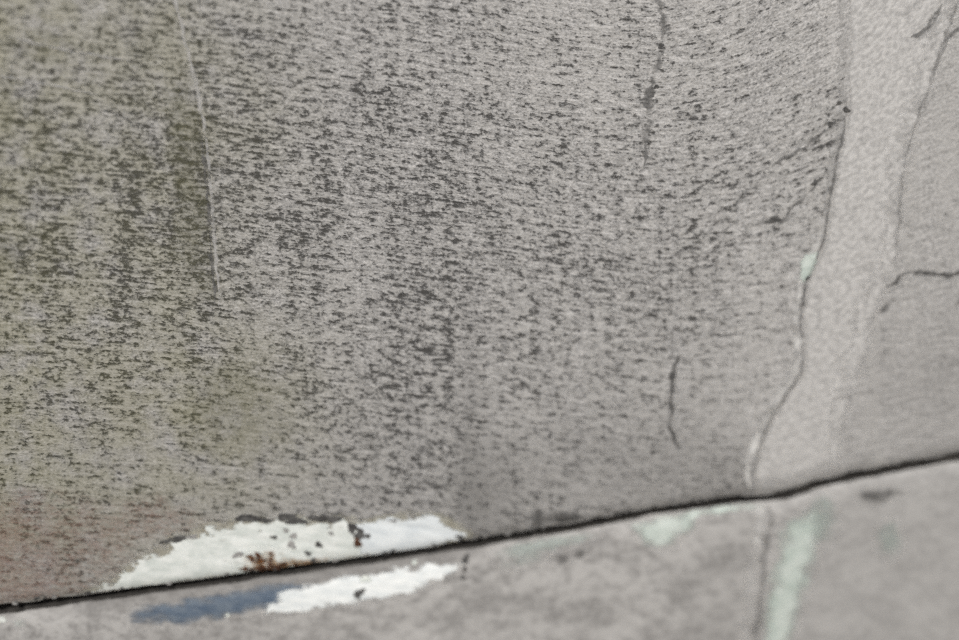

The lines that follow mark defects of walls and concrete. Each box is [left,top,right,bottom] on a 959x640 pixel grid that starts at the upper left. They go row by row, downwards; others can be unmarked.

crack [644,1,666,166]
crack [742,0,851,640]
crack [882,271,959,312]
rust [240,552,312,571]
peeling [83,511,471,623]